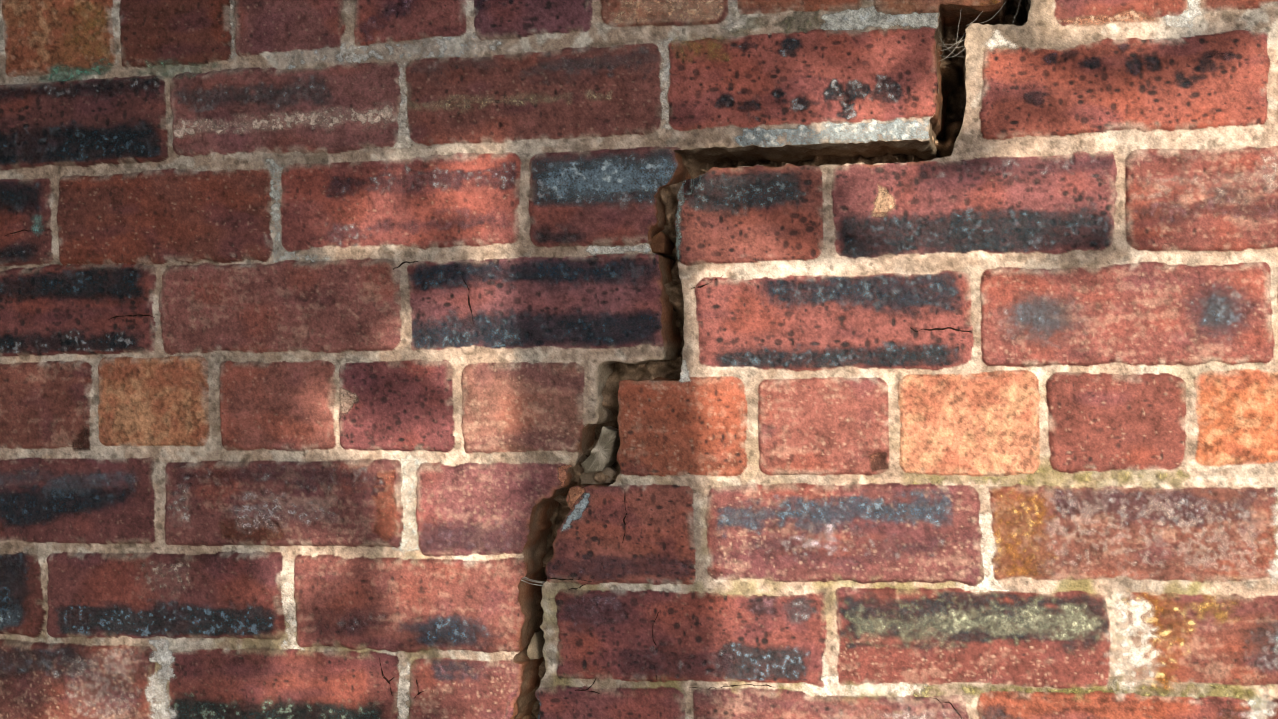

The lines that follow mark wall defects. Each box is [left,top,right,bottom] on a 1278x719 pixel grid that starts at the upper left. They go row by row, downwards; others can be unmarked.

crack [509,0,1031,719]